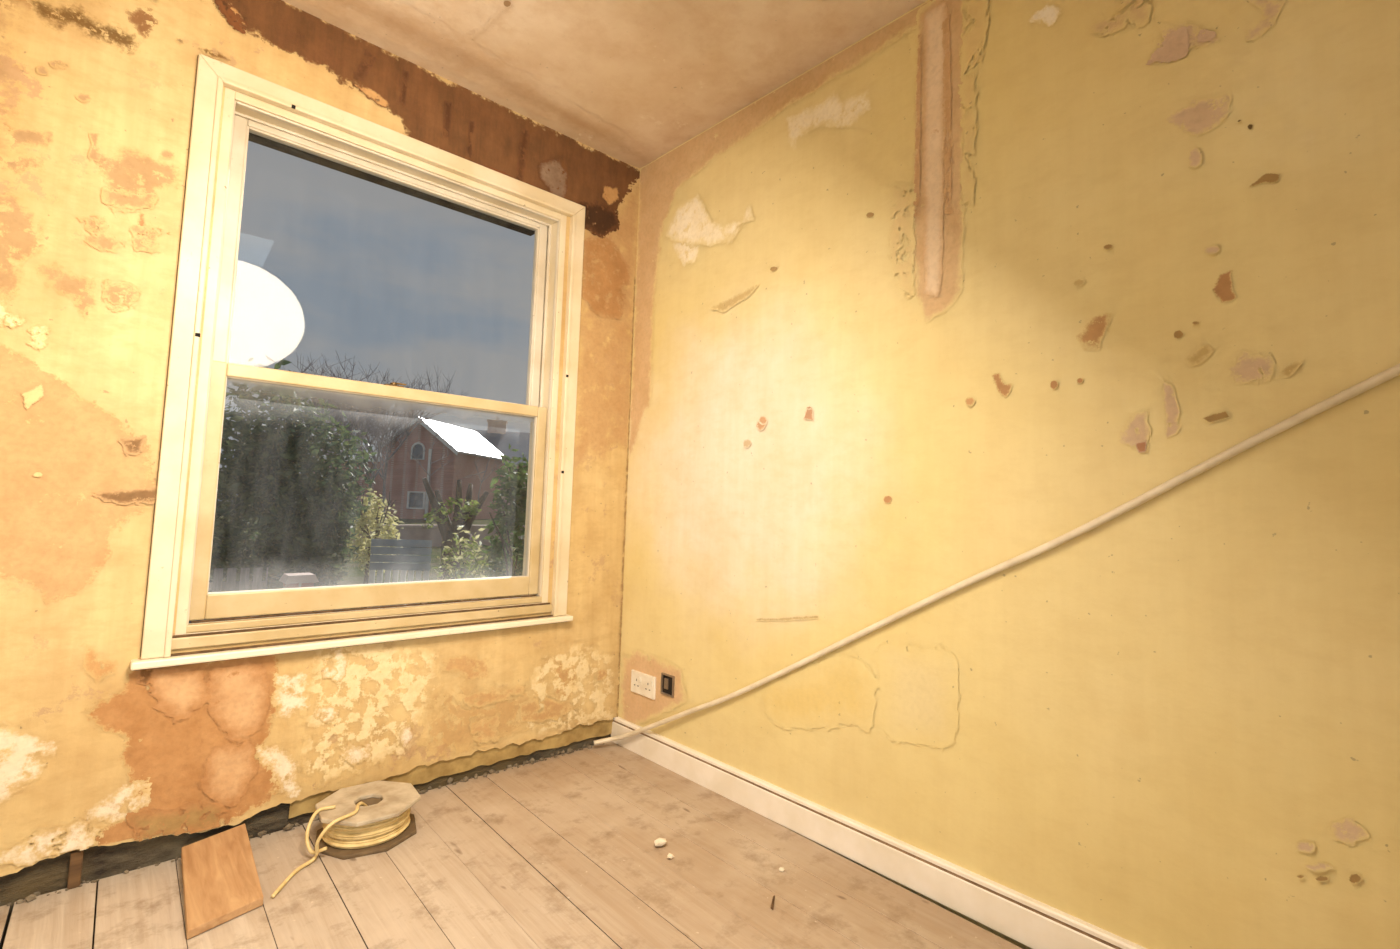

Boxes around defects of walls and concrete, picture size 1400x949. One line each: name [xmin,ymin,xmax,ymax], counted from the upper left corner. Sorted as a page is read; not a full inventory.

flaking render [125,0,160,39]
flaking render [176,34,232,62]
peeling [76,131,185,255]
flaking render [573,0,933,477]
flaking render [0,123,157,605]
flaking render [78,644,280,846]
peeling [295,639,687,792]